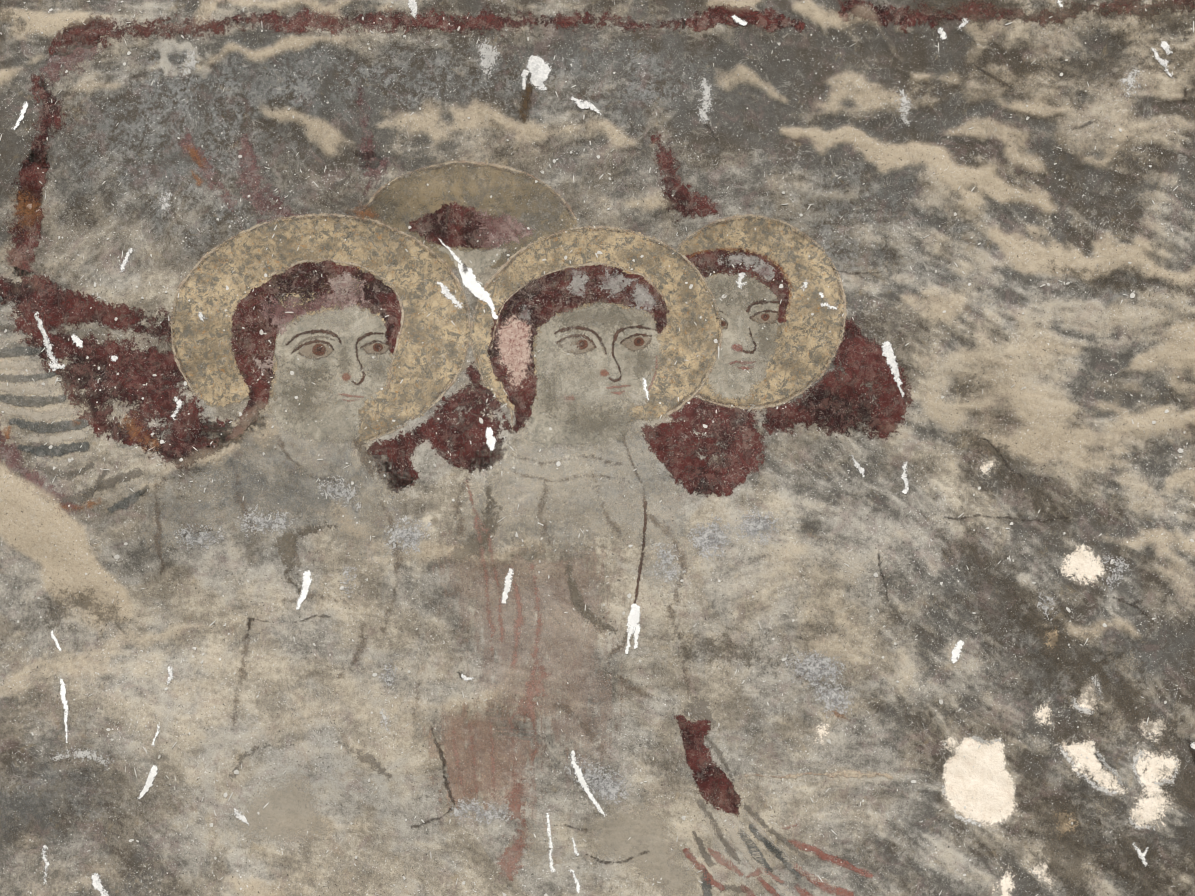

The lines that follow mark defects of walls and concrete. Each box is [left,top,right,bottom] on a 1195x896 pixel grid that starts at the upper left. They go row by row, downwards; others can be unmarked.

spalling [1060,544,1105,587]
peeling [564,754,698,896]
spalling [941,736,1018,827]
spalling [1057,717,1195,830]
spalling [992,860,1056,896]